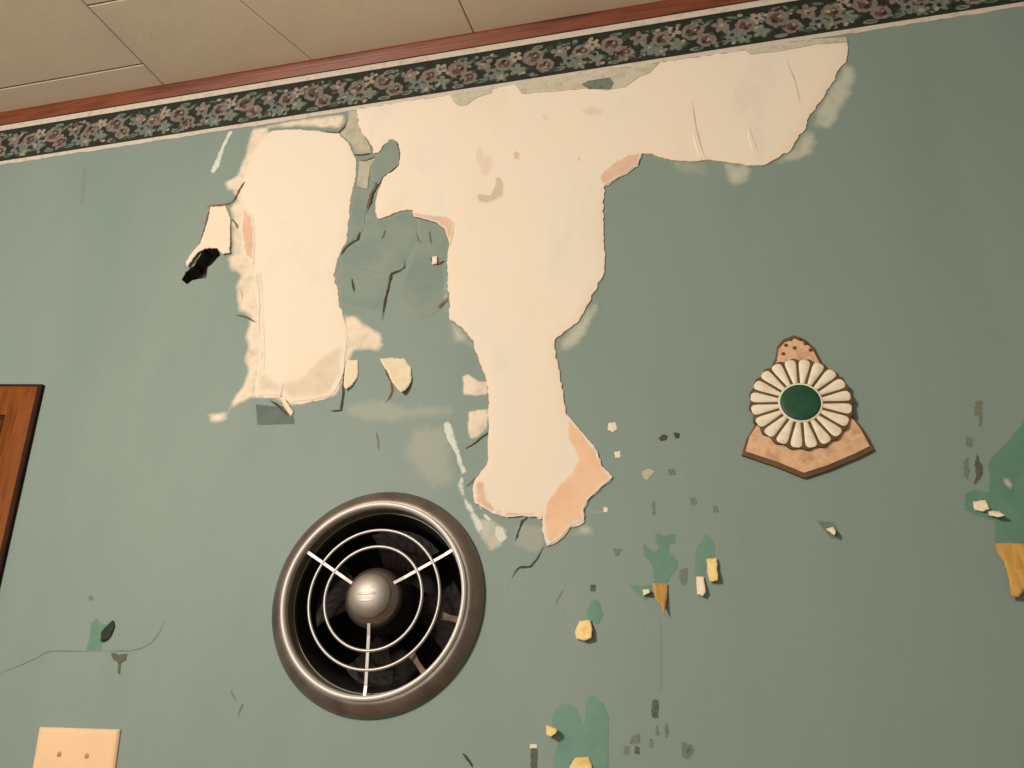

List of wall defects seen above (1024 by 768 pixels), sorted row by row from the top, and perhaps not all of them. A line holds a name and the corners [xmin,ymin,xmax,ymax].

peeling [182,37,861,547]
crack [515,517,528,541]
peeling [963,422,1024,597]
crack [512,548,543,577]
peeling [629,534,718,613]
peeling [575,584,603,641]
crack [1,650,89,673]
peeling [86,619,128,674]
peeling [546,695,609,768]